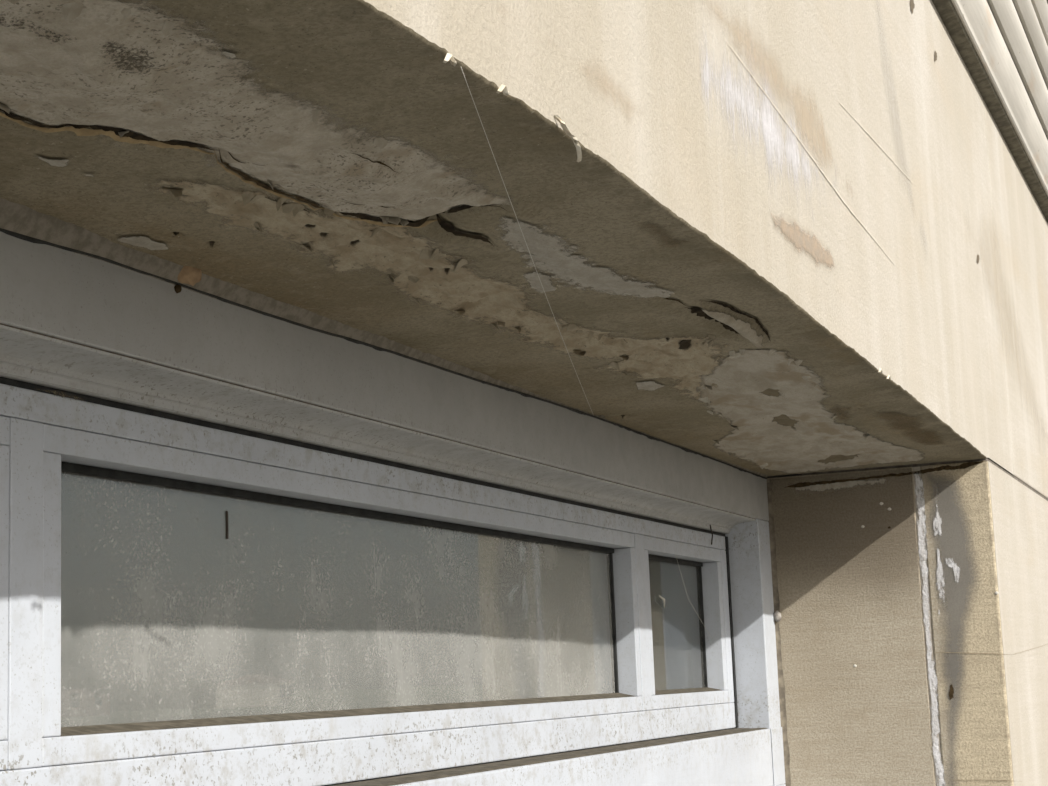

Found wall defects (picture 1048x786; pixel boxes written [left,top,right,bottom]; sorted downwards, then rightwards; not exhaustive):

crack [0,109,507,244]
spalling [0,0,924,491]
water stain [914,473,973,786]